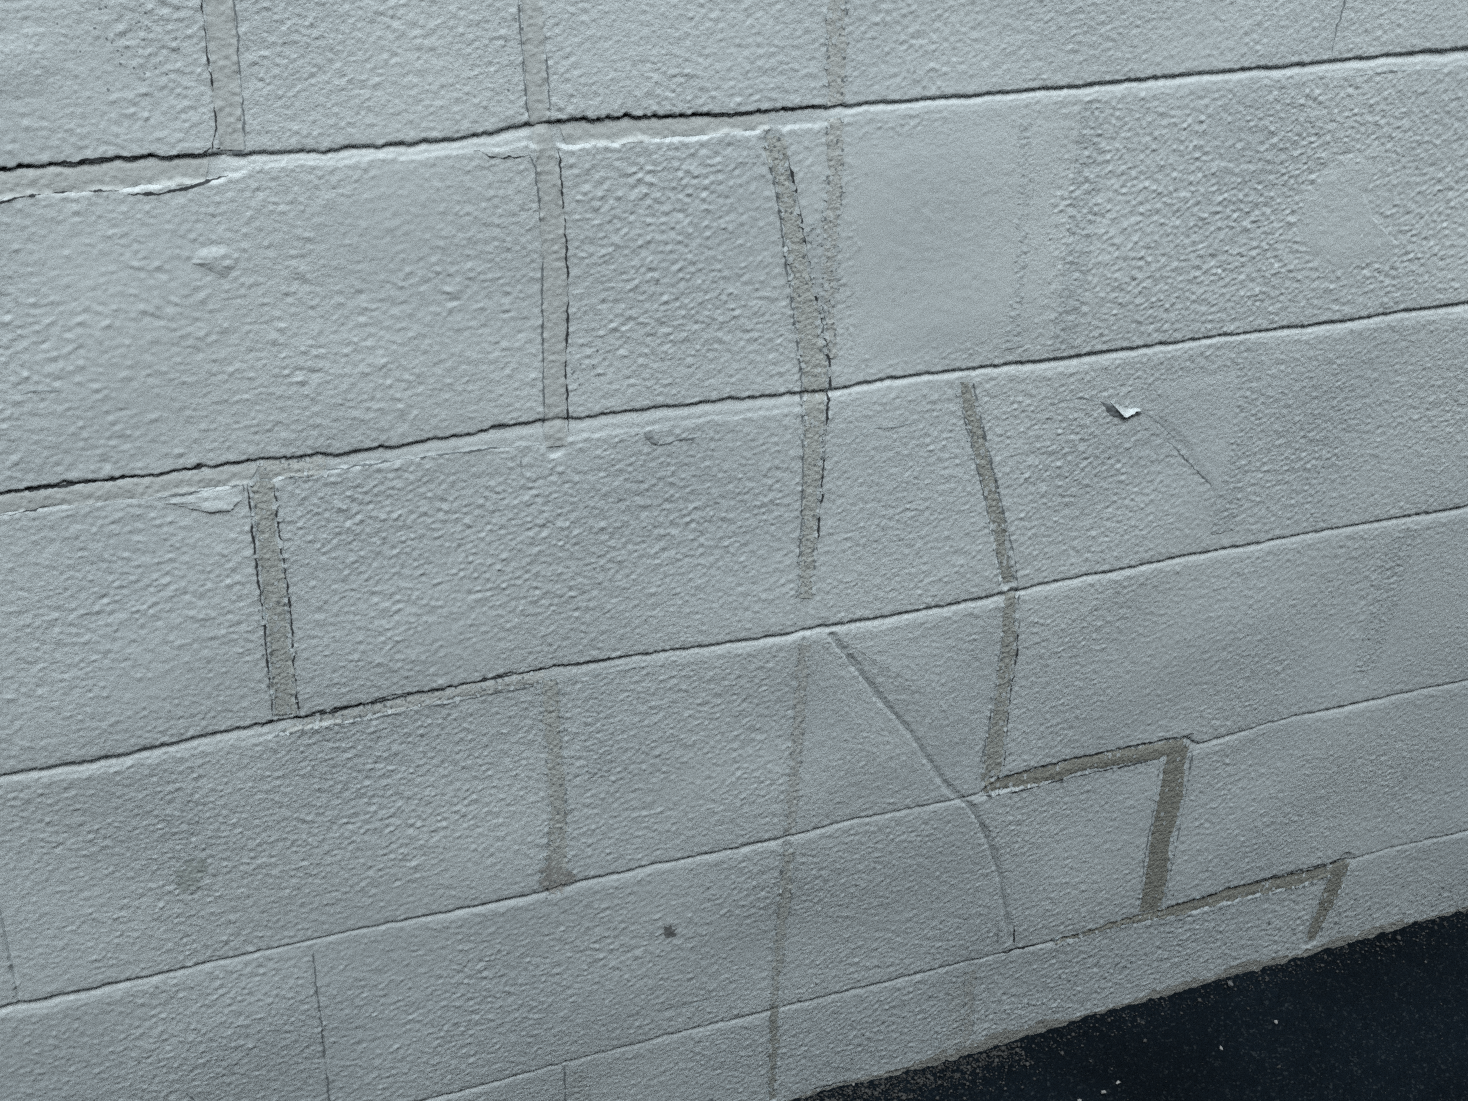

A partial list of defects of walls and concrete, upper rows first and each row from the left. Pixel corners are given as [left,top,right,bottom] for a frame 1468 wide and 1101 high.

crack [0,0,919,778]
crack [768,382,1350,1101]